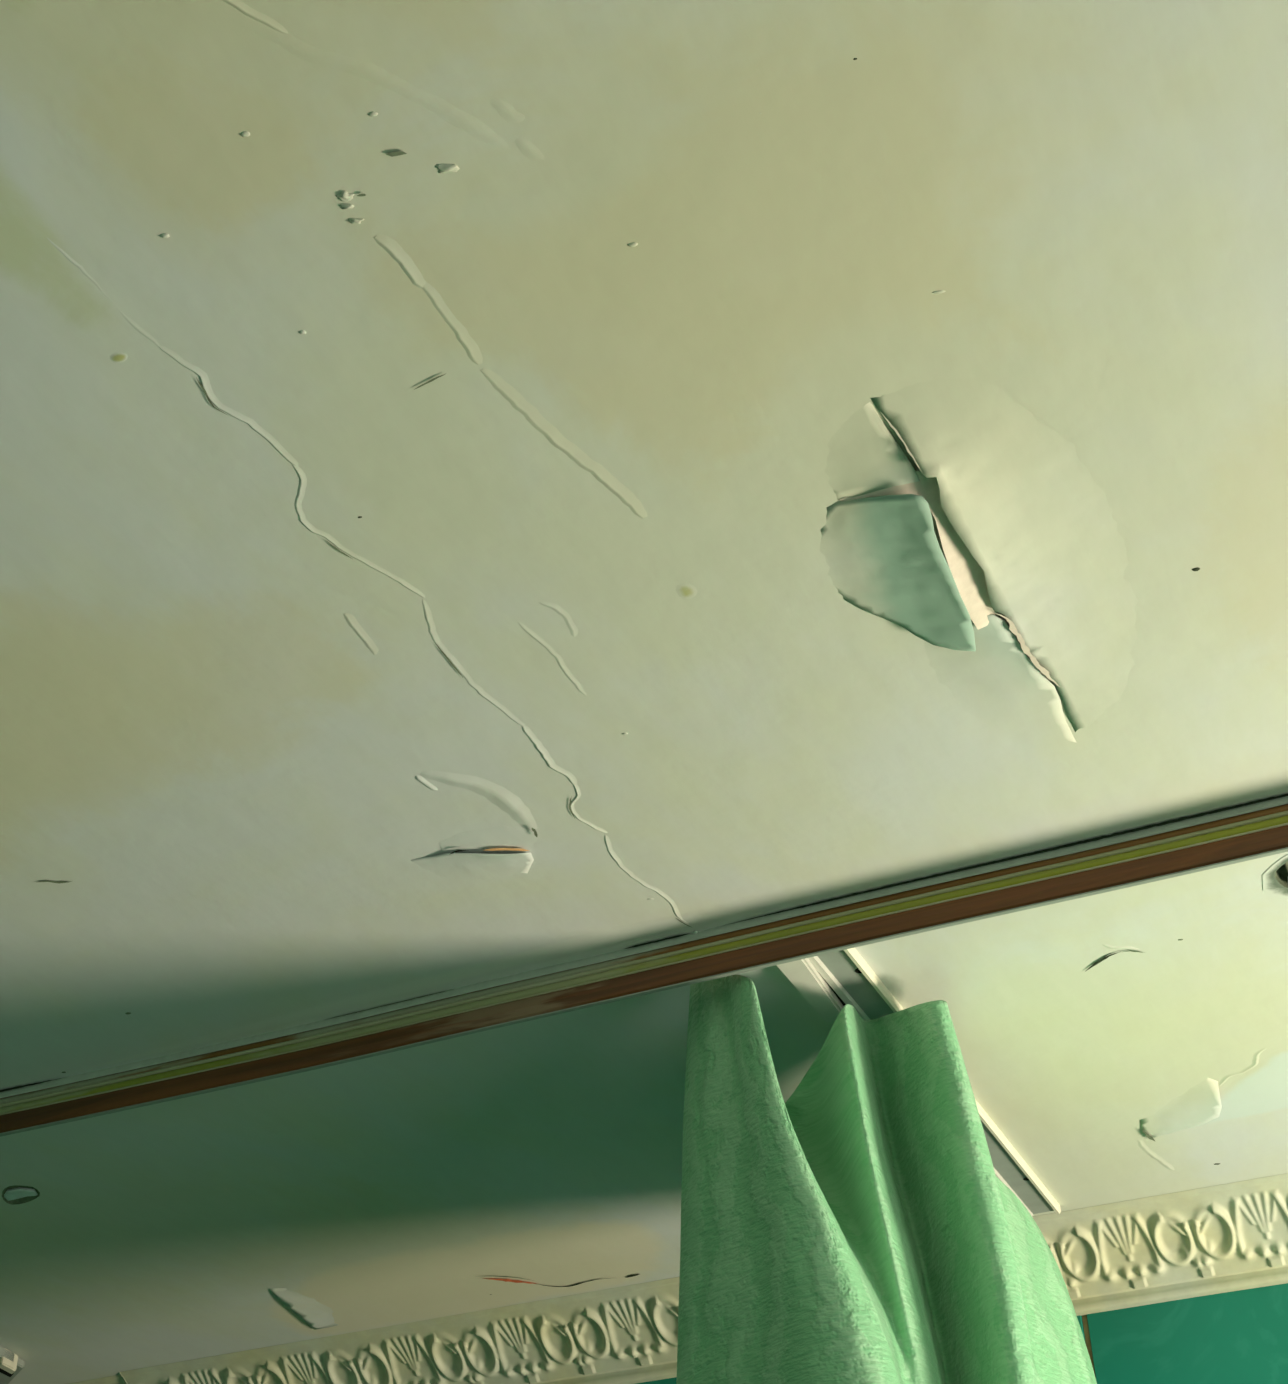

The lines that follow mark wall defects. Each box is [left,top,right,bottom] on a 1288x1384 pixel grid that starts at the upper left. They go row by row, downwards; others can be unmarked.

flaking render [820,378,1139,743]
crack [48,239,1288,949]
crack [1085,944,1144,972]
crack [325,989,453,1020]
crack [0,1077,65,1092]